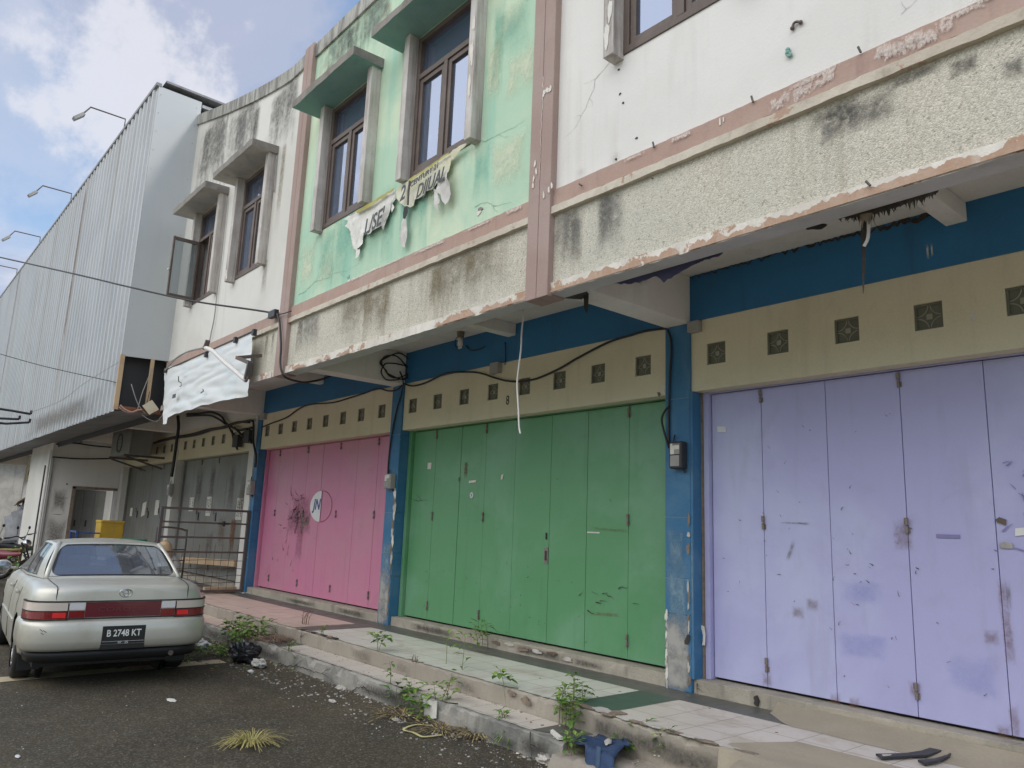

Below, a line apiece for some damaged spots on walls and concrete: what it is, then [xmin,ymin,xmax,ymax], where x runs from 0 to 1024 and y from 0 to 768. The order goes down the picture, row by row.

peeling [875,0,984,61]
leakage [235,103,258,149]
leakage [272,88,291,131]
peeling [771,64,836,109]
peeling [550,138,1024,313]
peeling [434,296,525,327]
peeling [378,488,396,623]
peeling [665,513,706,689]